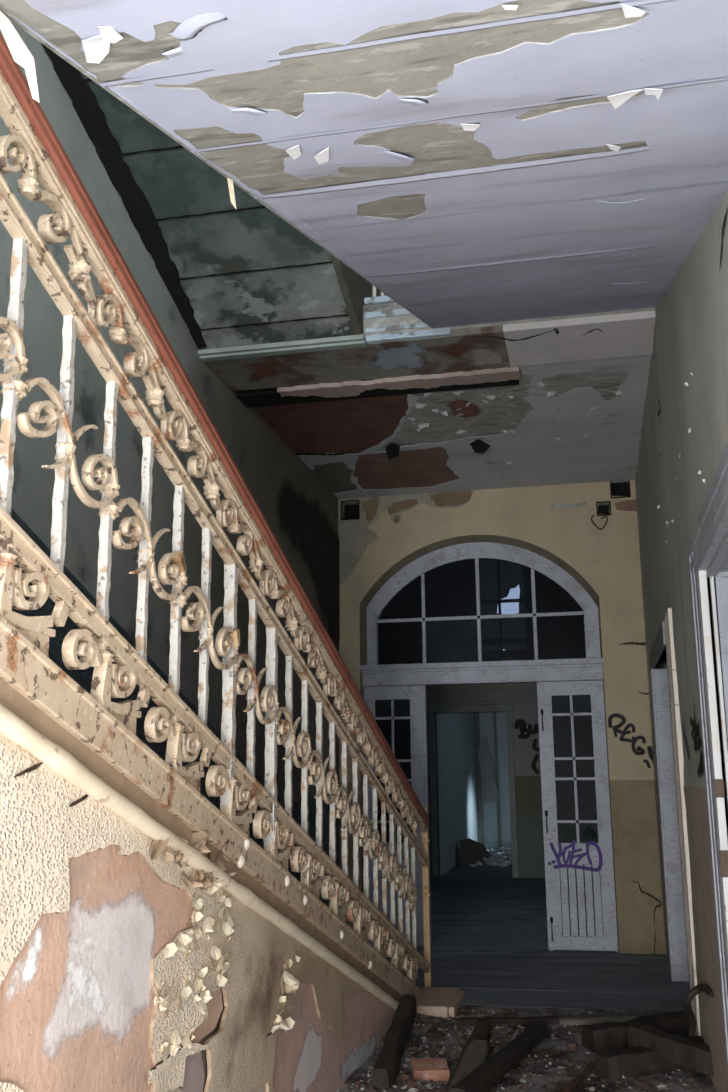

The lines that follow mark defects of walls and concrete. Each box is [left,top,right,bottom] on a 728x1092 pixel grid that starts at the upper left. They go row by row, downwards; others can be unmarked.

peeling [0,0,181,103]
peeling [155,0,648,117]
peeling [517,88,663,119]
peeling [357,194,426,219]
peeling [175,122,648,209]
crack [719,207,728,270]
peeling [277,367,637,584]
spalling [0,827,237,1092]
crack [626,881,662,954]
spalling [248,951,396,1092]